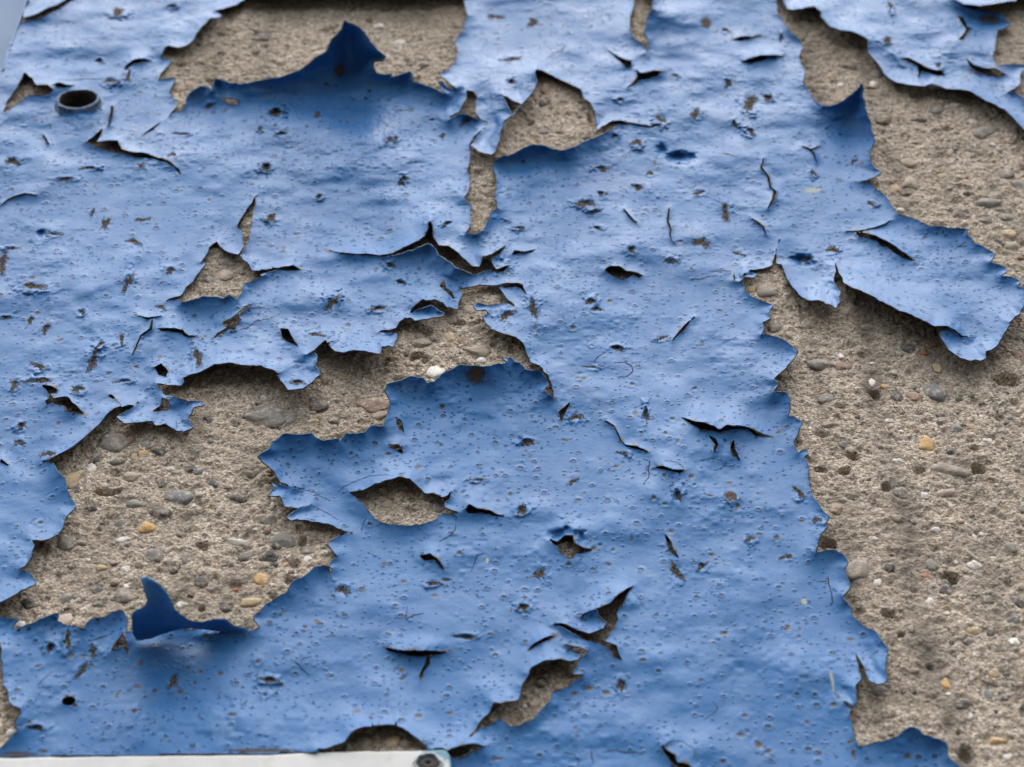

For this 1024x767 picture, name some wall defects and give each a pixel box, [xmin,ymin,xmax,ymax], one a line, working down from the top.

peeling [159,0,668,234]
peeling [154,196,299,311]
peeling [733,0,1024,767]
peeling [0,263,555,653]
crack [605,421,735,484]
peeling [315,723,439,753]
peeling [470,645,587,737]